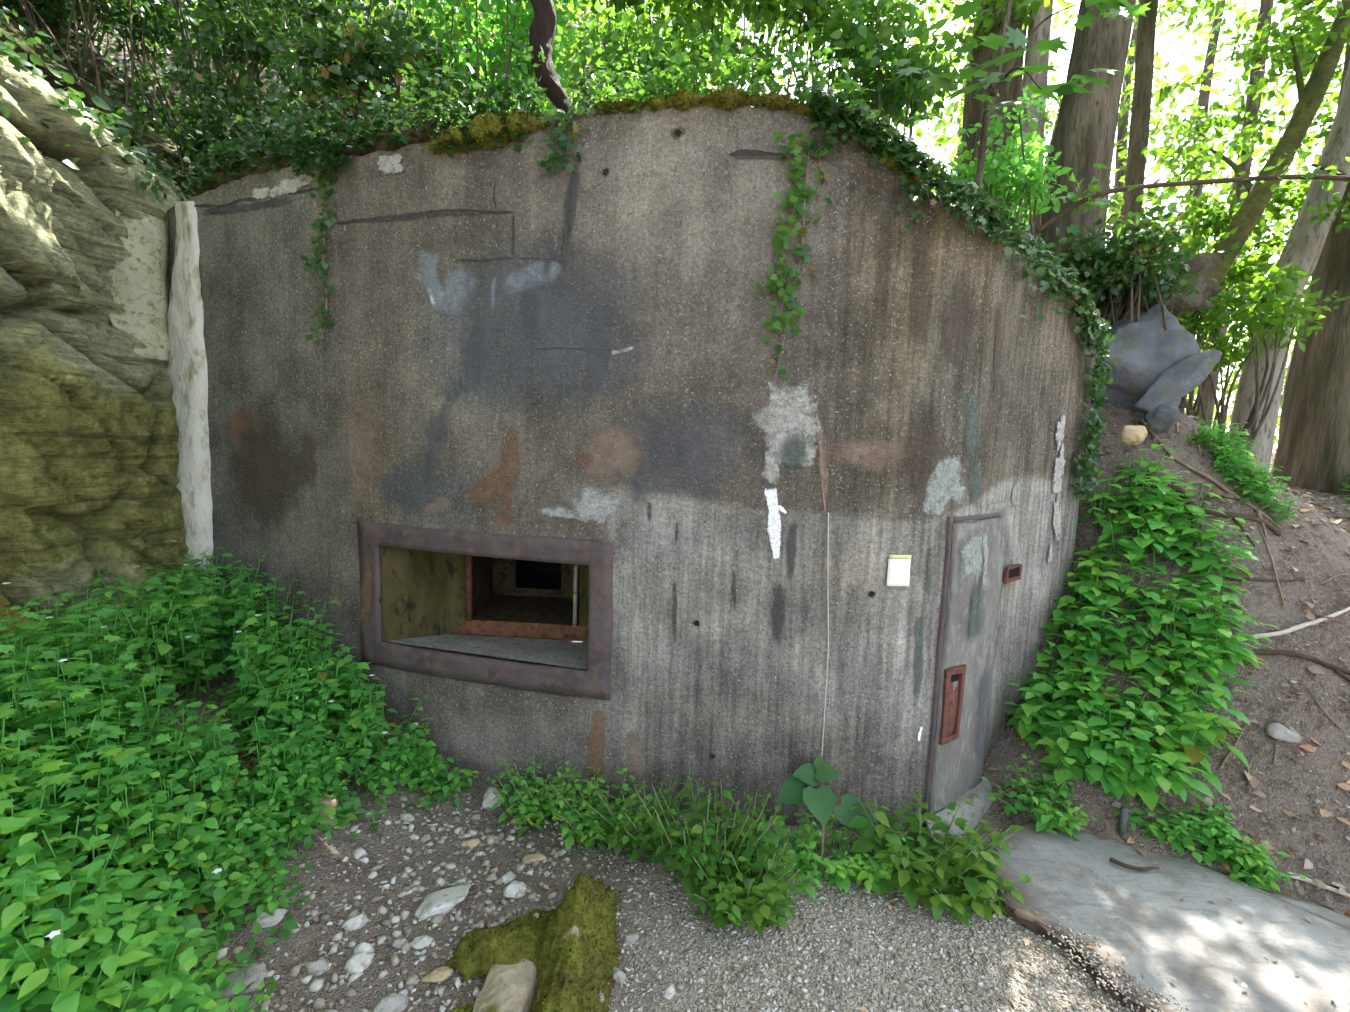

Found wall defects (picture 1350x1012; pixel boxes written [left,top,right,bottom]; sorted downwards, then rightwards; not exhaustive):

crack [335,165,579,263]
leakage [752,382,822,574]
leakage [772,586,785,641]
leakage [914,619,924,697]